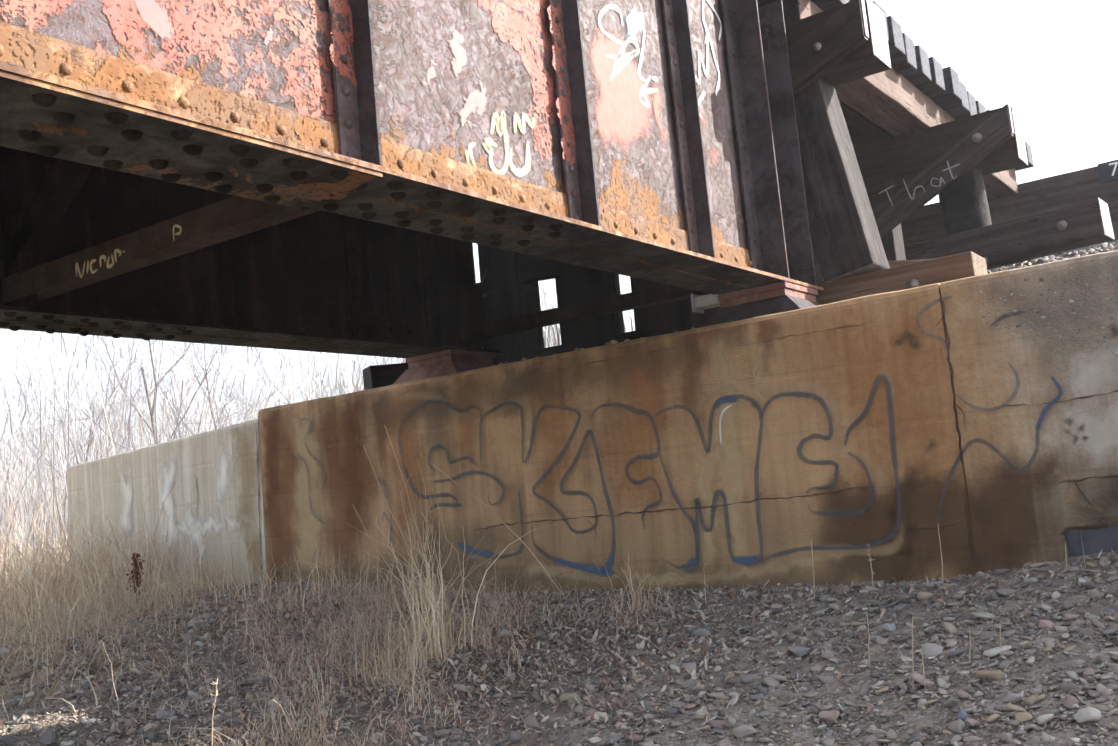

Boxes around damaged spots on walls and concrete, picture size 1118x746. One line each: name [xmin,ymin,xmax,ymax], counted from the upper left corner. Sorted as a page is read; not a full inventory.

peeling [0,0,357,154]
peeling [381,0,576,217]
corrosion [124,164,375,205]
peeling [712,224,751,268]
water stain [1075,347,1118,394]
crack [994,390,1118,408]
crack [895,288,973,563]
water stain [1073,408,1118,455]
corrosion [263,420,298,571]
crack [474,486,876,538]
crack [1057,475,1118,508]